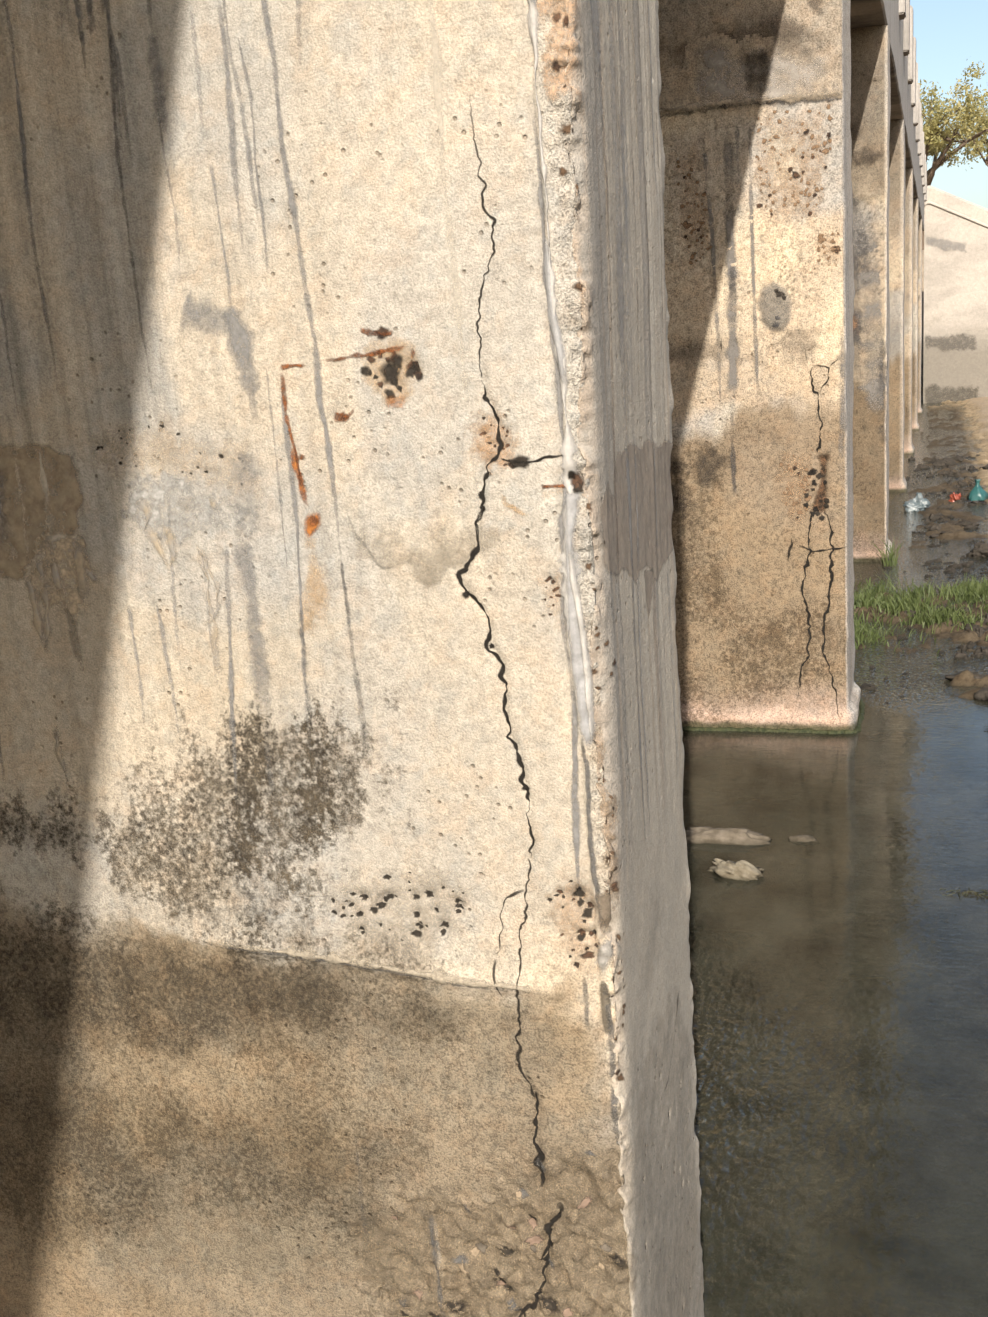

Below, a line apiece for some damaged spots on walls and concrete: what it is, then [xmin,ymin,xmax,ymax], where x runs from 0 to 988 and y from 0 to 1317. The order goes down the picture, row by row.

water stain [261,0,298,235]
corrosion [281,364,306,500]
corrosion [306,514,319,536]
water stain [305,296,335,494]
corrosion [335,411,353,421]
corrosion [331,326,423,403]
water stain [601,405,736,806]
water stain [708,188,788,394]
crack [788,511,844,710]
crack [810,359,838,451]
water stain [0,604,373,918]
crack [231,130,563,1317]